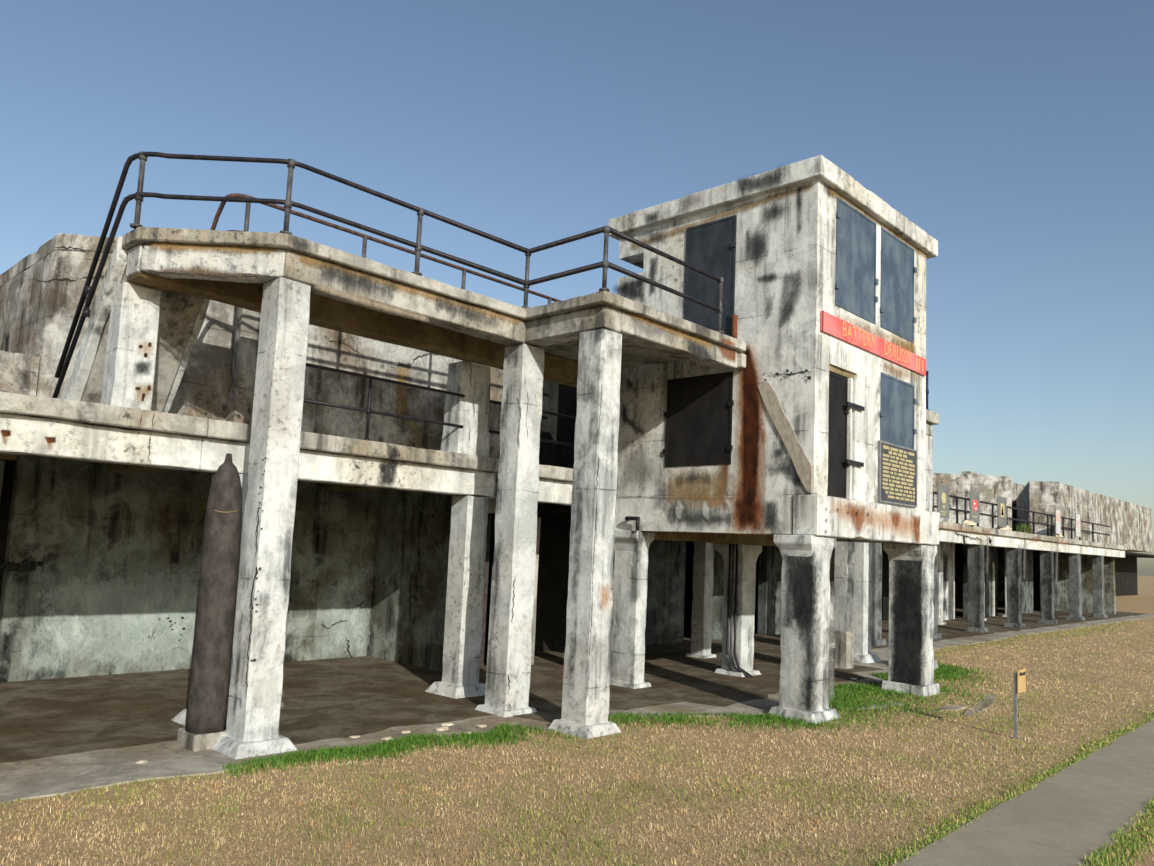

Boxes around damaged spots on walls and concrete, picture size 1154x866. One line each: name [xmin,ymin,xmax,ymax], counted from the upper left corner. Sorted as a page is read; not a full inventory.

water stain [632,169,811,264]
water stain [154,243,275,252]
water stain [294,240,519,324]
water stain [614,257,657,301]
water stain [759,271,801,326]
water stain [630,312,712,361]
corrosion [712,339,765,529]
corrosion [826,508,920,541]
water stain [784,551,834,712]